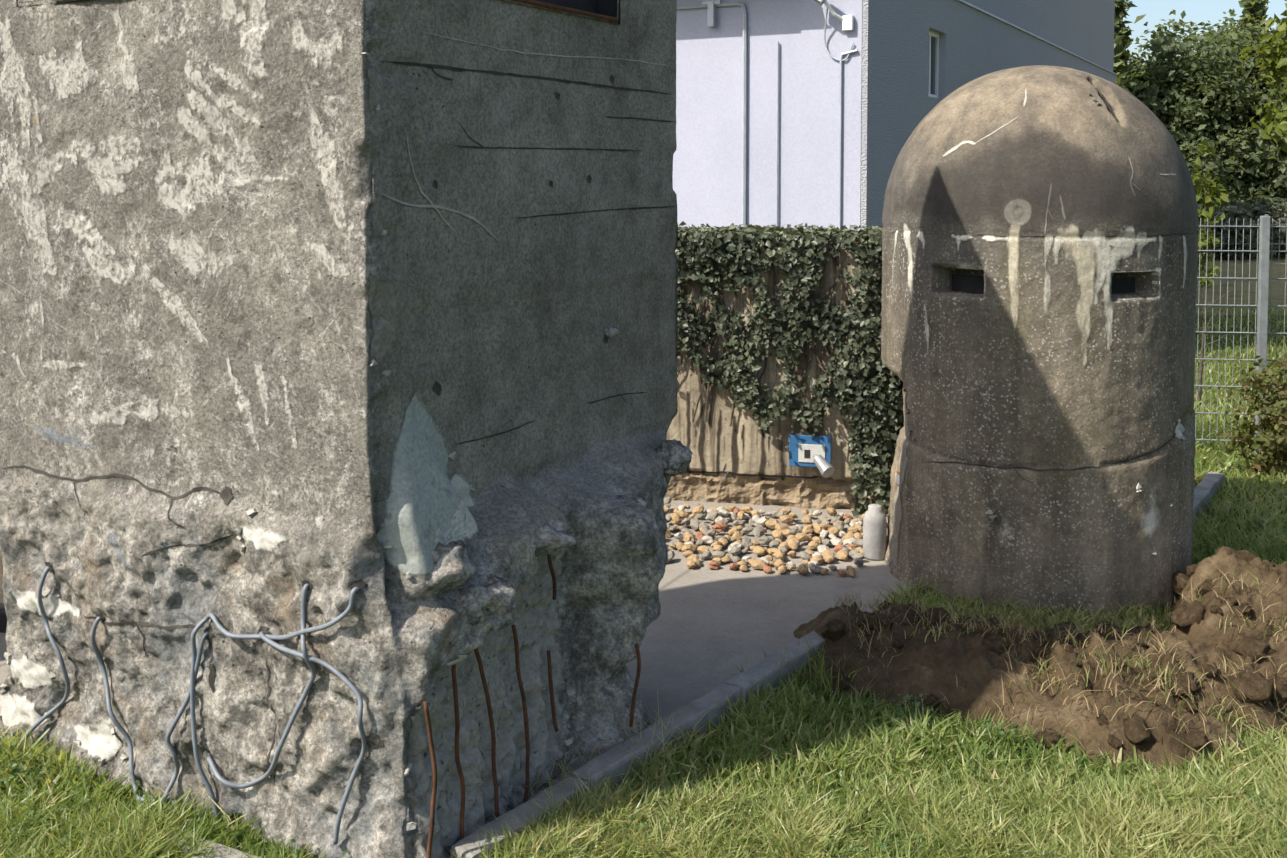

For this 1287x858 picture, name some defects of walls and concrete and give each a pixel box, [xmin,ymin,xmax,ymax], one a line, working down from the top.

water stain [893,224,929,355]
water stain [920,138,1163,365]
crack [2,465,233,557]
spalling [377,393,478,579]
crack [929,433,1176,483]
spalling [404,548,578,858]